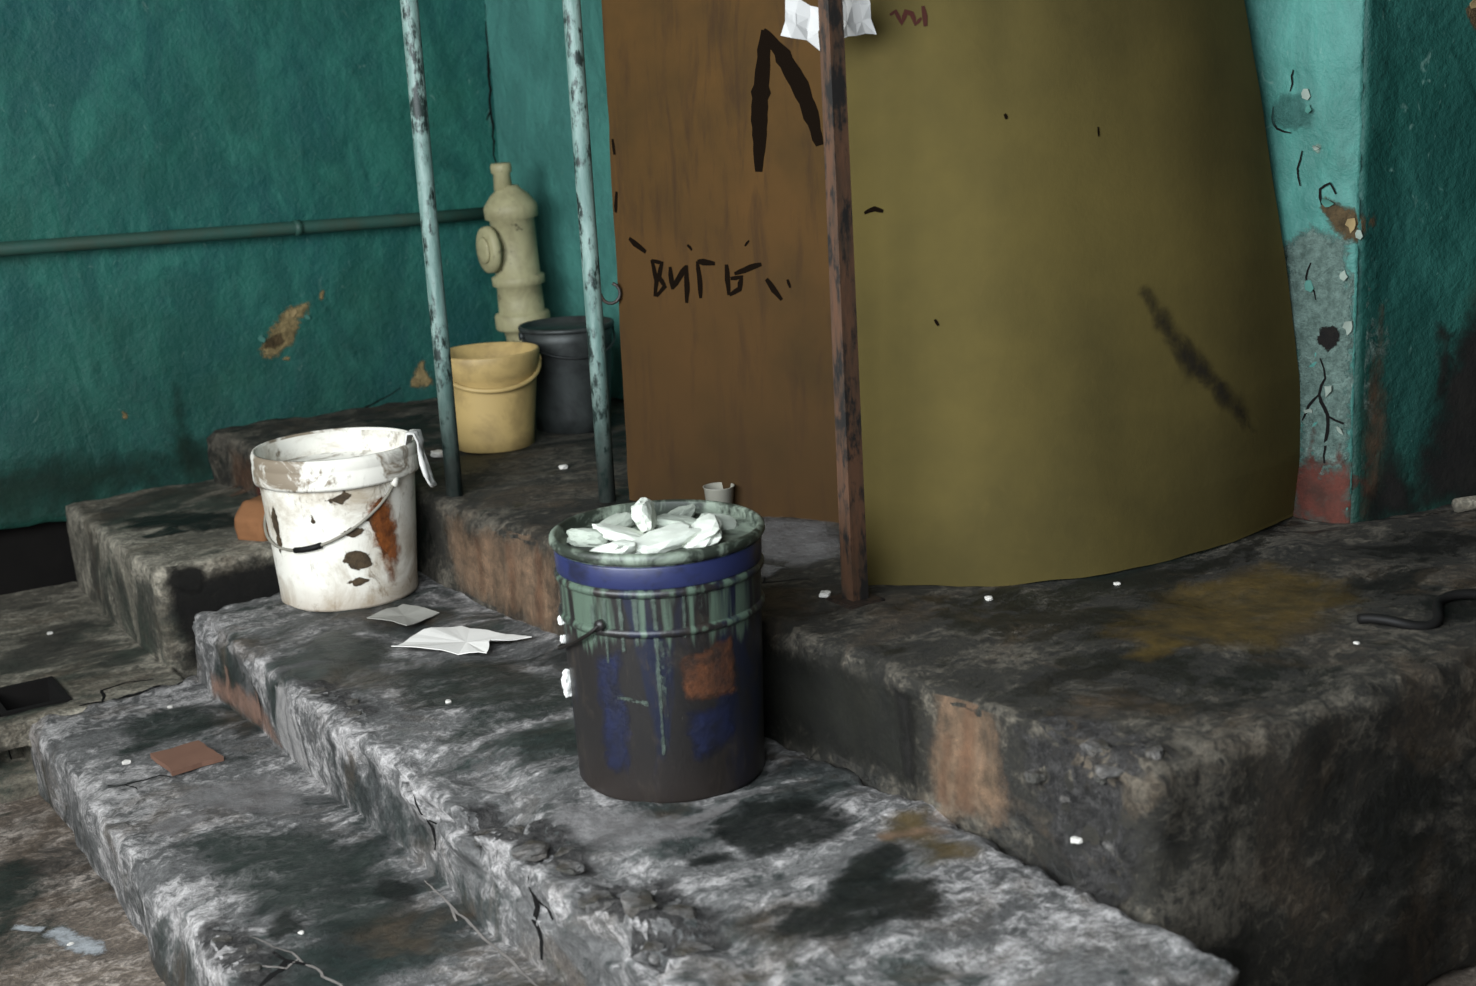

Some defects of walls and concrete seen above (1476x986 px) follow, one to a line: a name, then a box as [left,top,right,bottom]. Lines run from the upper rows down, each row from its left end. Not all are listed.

peeling [1296,144,1320,186]
peeling [258,291,324,360]
flaking render [1283,182,1384,474]